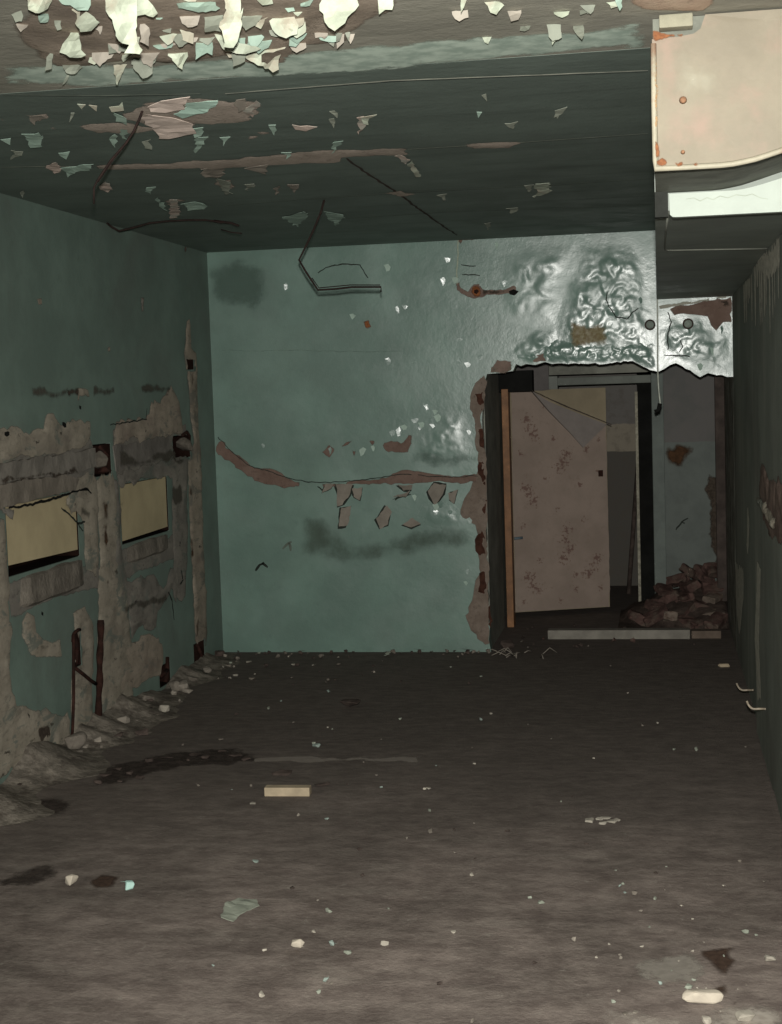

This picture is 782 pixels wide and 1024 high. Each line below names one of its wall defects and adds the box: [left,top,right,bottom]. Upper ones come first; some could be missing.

peeling [7,0,713,86]
corrosion [653,31,683,41]
peeling [0,114,53,160]
peeling [46,97,421,195]
corrosion [655,142,697,166]
peeling [145,187,207,218]
corrosion [456,239,519,298]
flaking render [659,296,732,334]
flaking render [216,354,511,645]
flaking render [0,319,207,778]